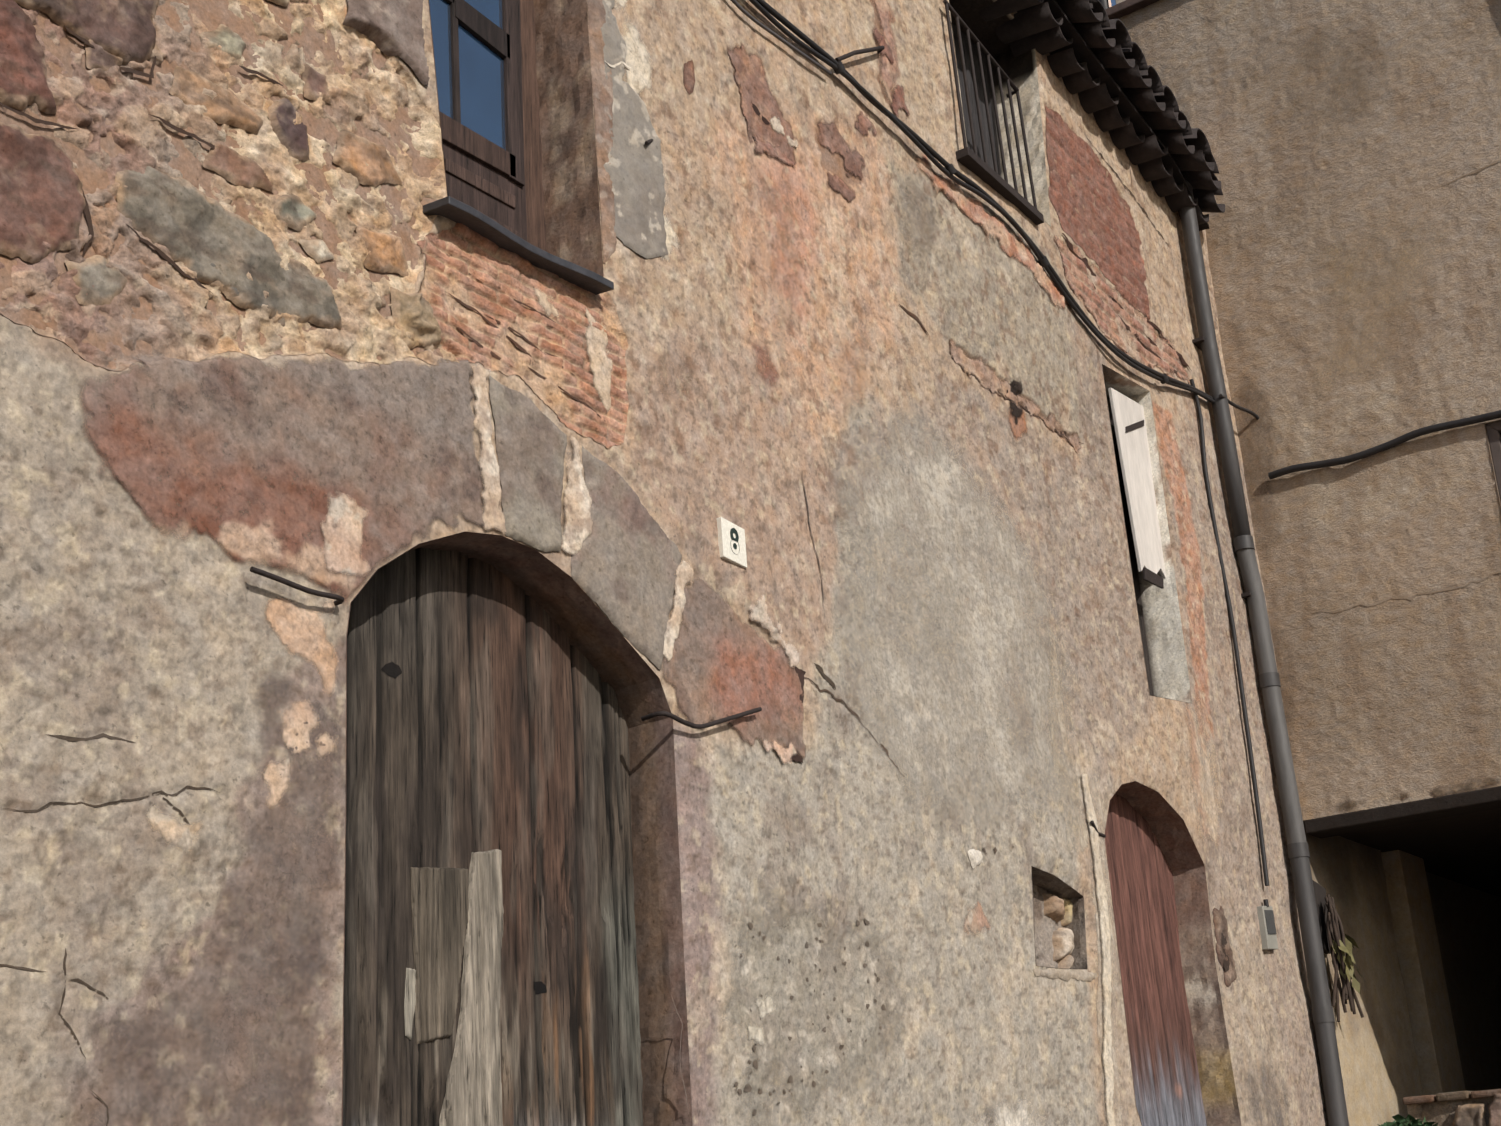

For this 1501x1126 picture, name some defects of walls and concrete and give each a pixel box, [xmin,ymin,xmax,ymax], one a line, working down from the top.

peeling [605,0,651,94]
flaking render [728,44,798,166]
flaking render [817,111,877,202]
spalling [0,0,629,449]
flaking render [914,107,1192,380]
flaking render [266,599,337,692]
flaking render [750,595,806,703]
crack [46,733,135,743]
crack [5,785,220,825]
flaking render [264,701,334,806]
crack [804,663,905,777]
crack [0,948,109,1126]